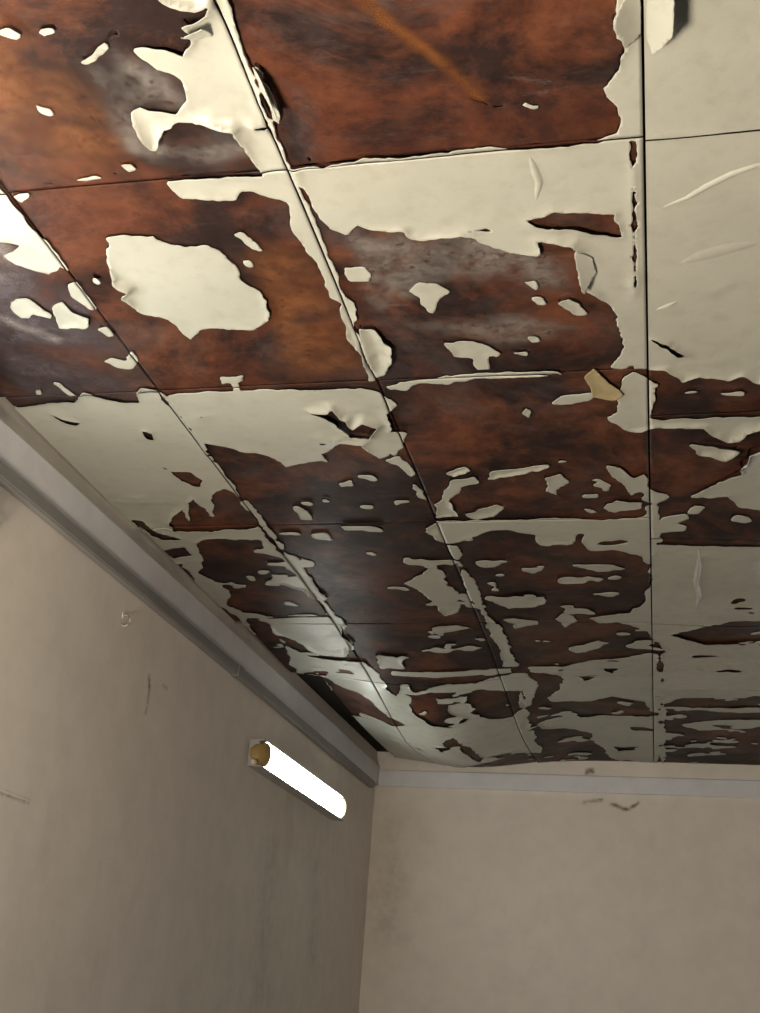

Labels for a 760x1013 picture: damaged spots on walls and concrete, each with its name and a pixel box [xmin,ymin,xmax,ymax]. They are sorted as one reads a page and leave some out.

peeling [0,0,760,767]